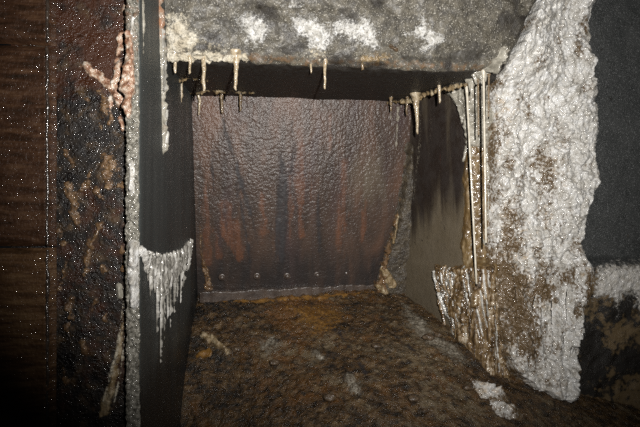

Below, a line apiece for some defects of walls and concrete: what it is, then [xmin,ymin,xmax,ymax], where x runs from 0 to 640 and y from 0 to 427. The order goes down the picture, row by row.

efflorescence [81,0,213,427]
efflorescence [282,0,391,64]
efflorescence [374,210,399,295]
leakage [386,0,640,420]